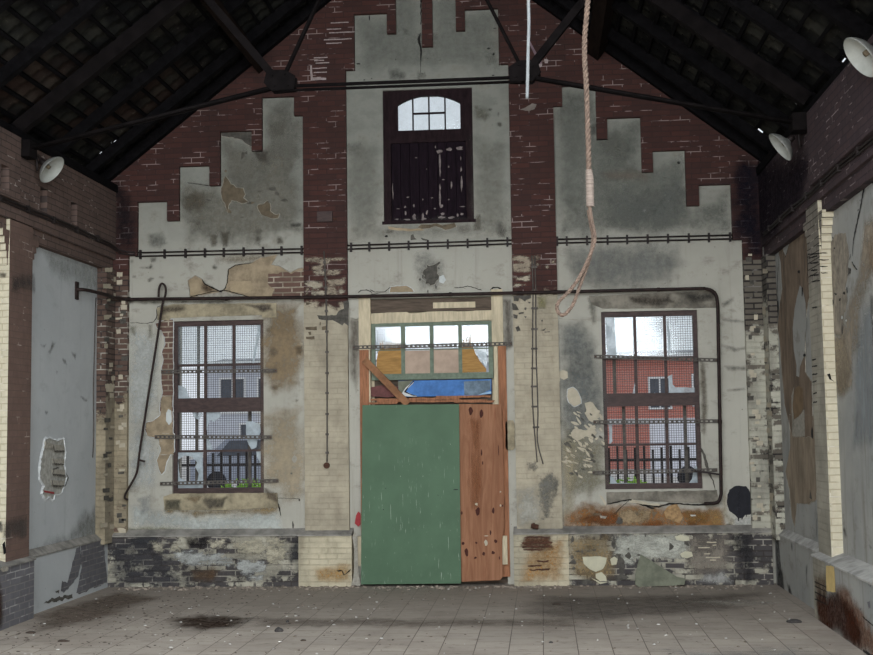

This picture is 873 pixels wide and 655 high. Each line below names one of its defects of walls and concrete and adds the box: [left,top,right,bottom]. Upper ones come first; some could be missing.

crack [417,0,428,74]
peeling [385,146,465,241]
crack [848,182,873,274]
peeling [188,254,349,340]
peeling [827,221,873,393]
peeling [145,319,175,475]
peeling [559,370,606,478]
peeling [777,233,817,538]
corrosion [521,536,613,584]
corrosion [565,504,723,526]
peeling [612,533,689,581]
corrosion [815,579,873,654]